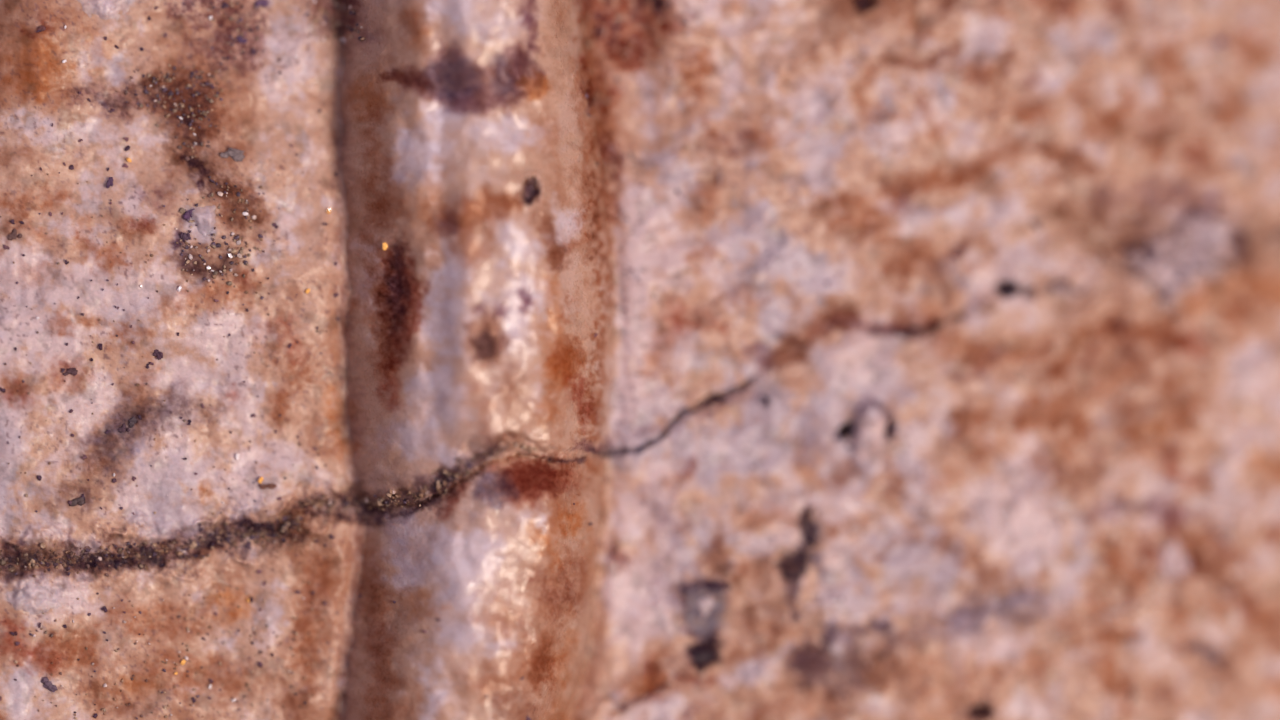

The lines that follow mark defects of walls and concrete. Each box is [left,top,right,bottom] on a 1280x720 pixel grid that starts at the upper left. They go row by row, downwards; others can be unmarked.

crack [893,317,961,335]
crack [603,384,746,456]
crack [0,442,537,578]